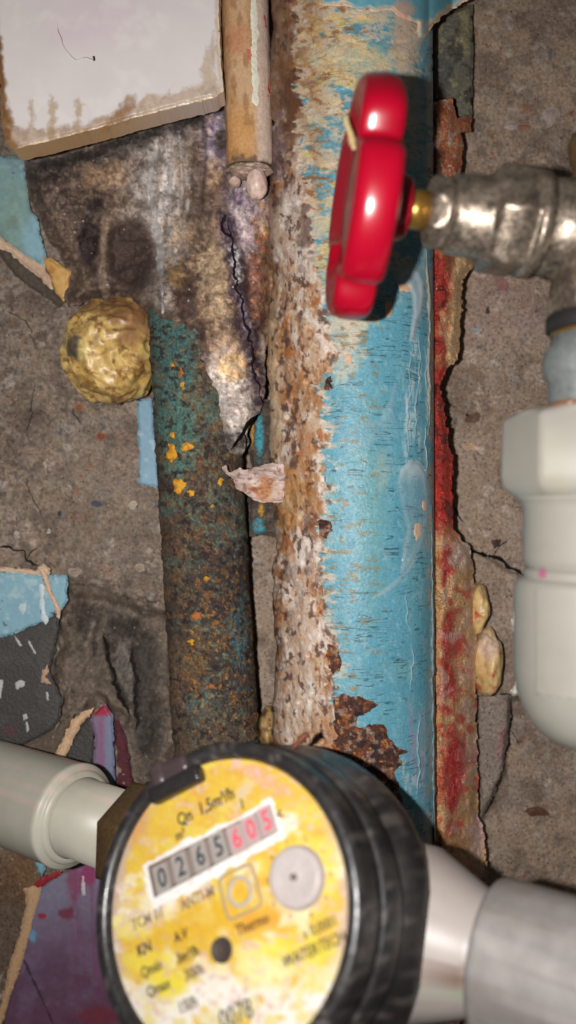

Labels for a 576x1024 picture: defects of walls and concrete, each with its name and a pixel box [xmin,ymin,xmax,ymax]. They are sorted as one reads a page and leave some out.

peeling [0,155,71,308]
damp [139,136,190,314]
crack [220,214,263,449]
peeling [385,282,413,317]
peeling [425,248,433,427]
crack [470,540,523,575]
spalling [0,564,175,789]
rust [331,693,408,805]
peeling [414,500,437,838]
crack [480,693,519,857]